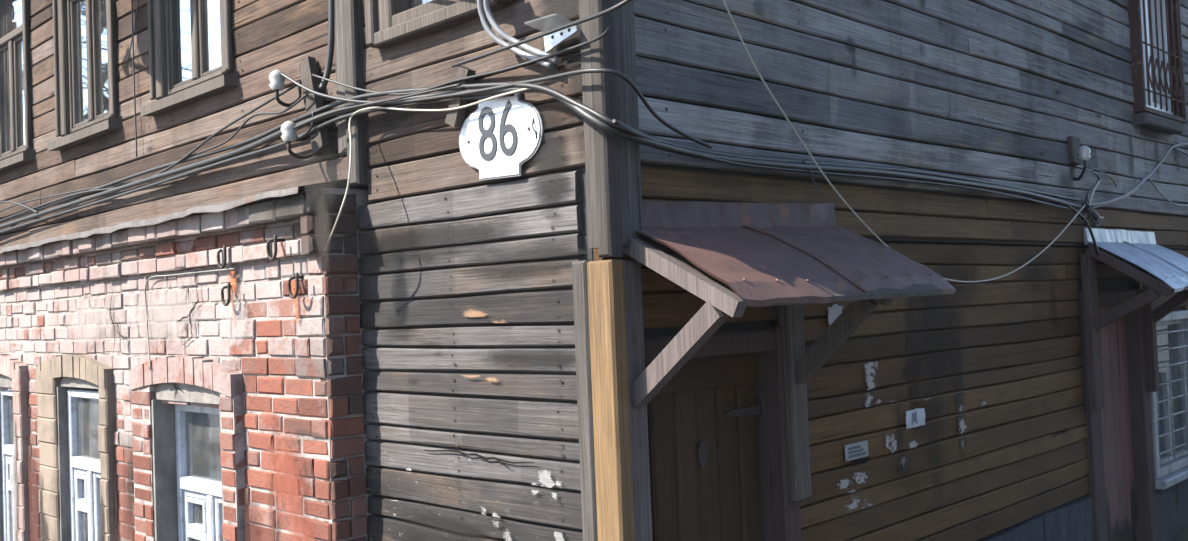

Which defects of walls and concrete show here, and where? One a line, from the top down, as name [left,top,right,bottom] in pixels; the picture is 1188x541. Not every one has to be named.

peeling [865,358,898,407]
peeling [886,434,921,466]
peeling [532,470,561,499]
peeling [837,472,873,515]